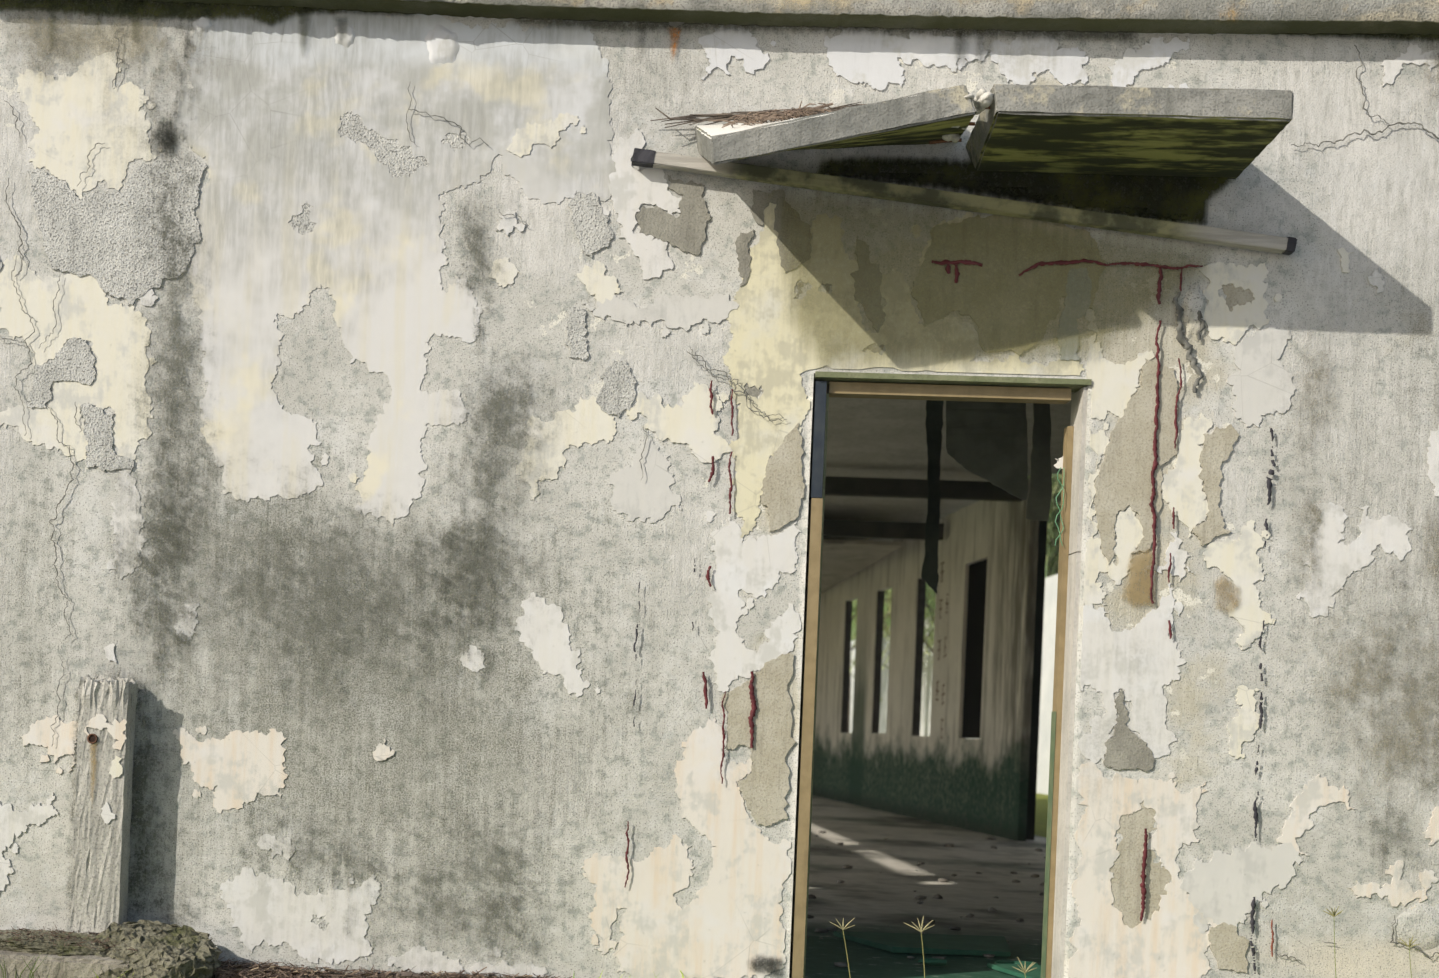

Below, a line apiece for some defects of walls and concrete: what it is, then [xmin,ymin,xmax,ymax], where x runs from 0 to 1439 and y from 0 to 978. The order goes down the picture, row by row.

damp [151,108,180,154]
peeling [824,29,1088,91]
crack [1292,45,1439,147]
peeling [0,0,711,579]
damp [465,210,490,293]
damp [133,184,197,664]
damp [440,379,536,628]
peeling [515,189,1355,978]
rust [1123,551,1152,605]
damp [128,702,186,923]
peeling [173,726,288,813]
peeling [220,834,381,965]